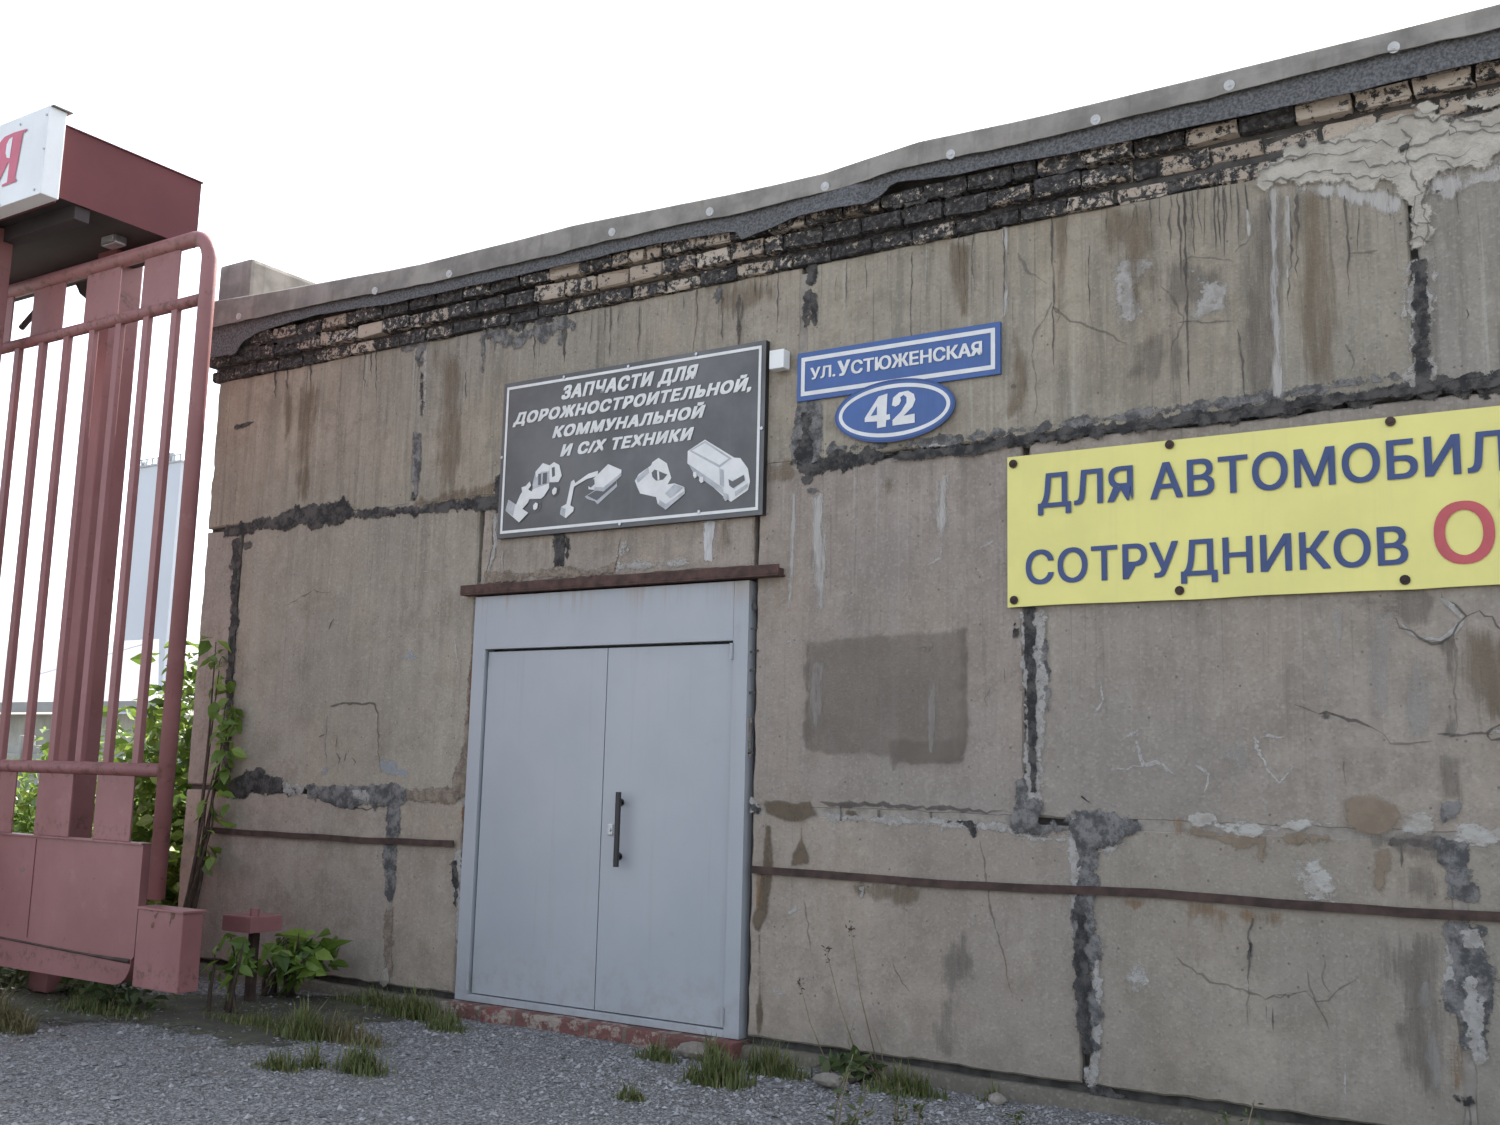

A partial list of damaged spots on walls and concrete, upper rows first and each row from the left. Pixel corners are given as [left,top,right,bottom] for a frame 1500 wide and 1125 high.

peeling [1255,92,1500,249]
leakage [668,155,1135,364]
leakage [767,180,1500,607]
crack [1391,593,1500,645]
peeling [1036,638,1051,711]
crack [1437,724,1500,741]
peeling [352,790,370,802]
crack [1247,918,1274,1027]
spalling [1084,1065,1125,1099]